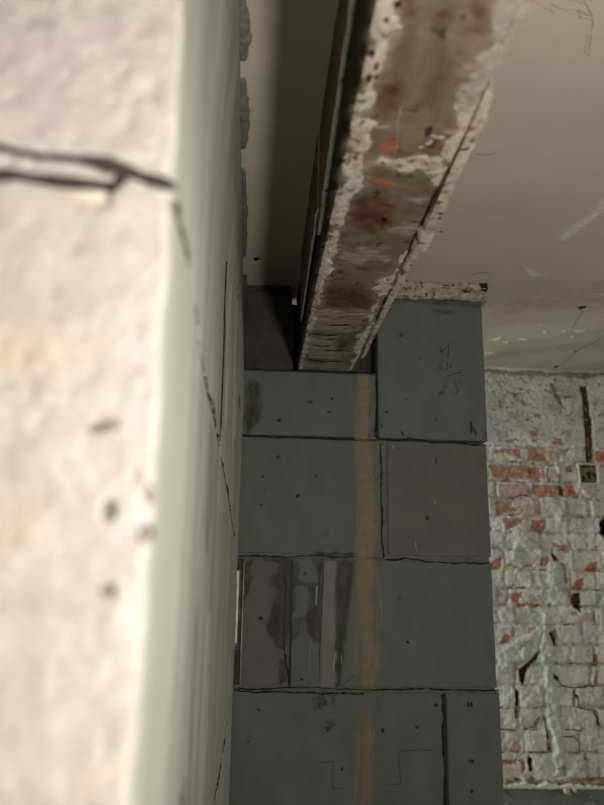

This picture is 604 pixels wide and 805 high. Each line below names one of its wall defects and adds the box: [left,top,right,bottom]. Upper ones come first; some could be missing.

peeling [374,0,528,186]
peeling [298,0,408,370]
spalling [484,368,604,379]
spalling [486,430,579,532]
spalling [585,438,604,463]
spalling [491,543,568,570]
damp [263,557,293,647]
spalling [497,584,539,607]
spalling [563,561,598,622]
spalling [514,653,537,718]
crack [559,682,600,750]
spalling [501,738,532,775]